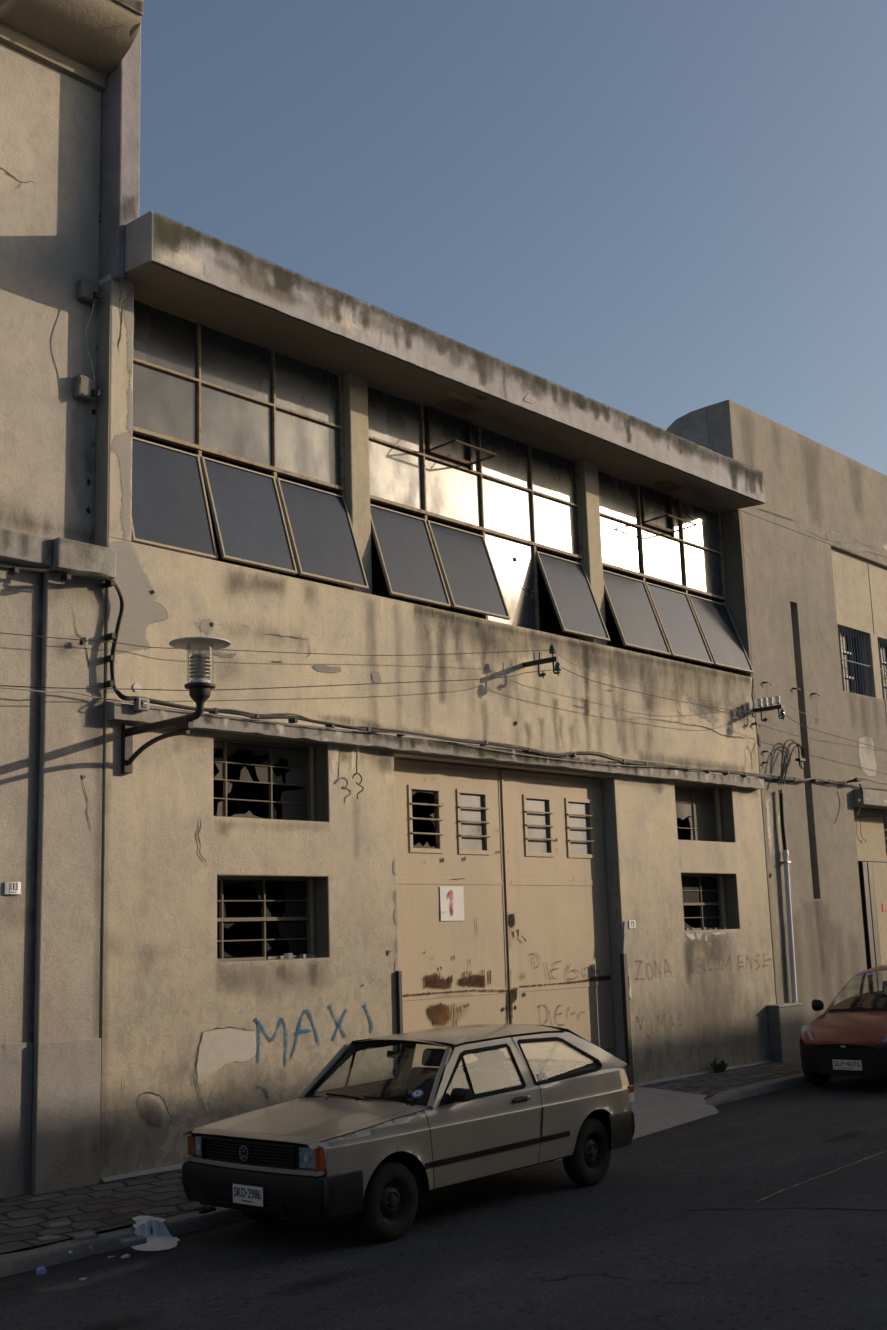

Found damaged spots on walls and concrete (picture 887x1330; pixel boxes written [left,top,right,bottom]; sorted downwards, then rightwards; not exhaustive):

crack [0,167,39,188]
leakage [155,214,763,492]
peeling [86,289,168,693]
leakage [571,642,644,714]
leakage [367,735,451,747]
leakage [480,748,597,765]
corrosion [403,952,610,1026]
peeling [193,1026,256,1117]